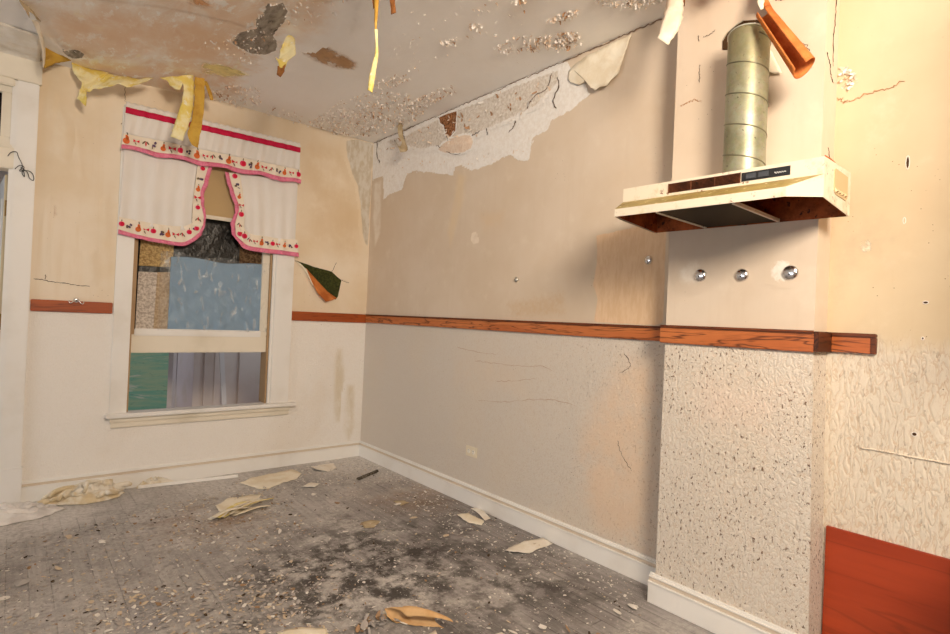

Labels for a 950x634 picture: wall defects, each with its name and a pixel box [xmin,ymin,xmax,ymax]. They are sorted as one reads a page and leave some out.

peeling [58,46,87,61]
peeling [204,0,348,64]
peeling [595,0,685,45]
crack [803,0,905,104]
peeling [313,0,593,215]
water stain [328,343,360,442]